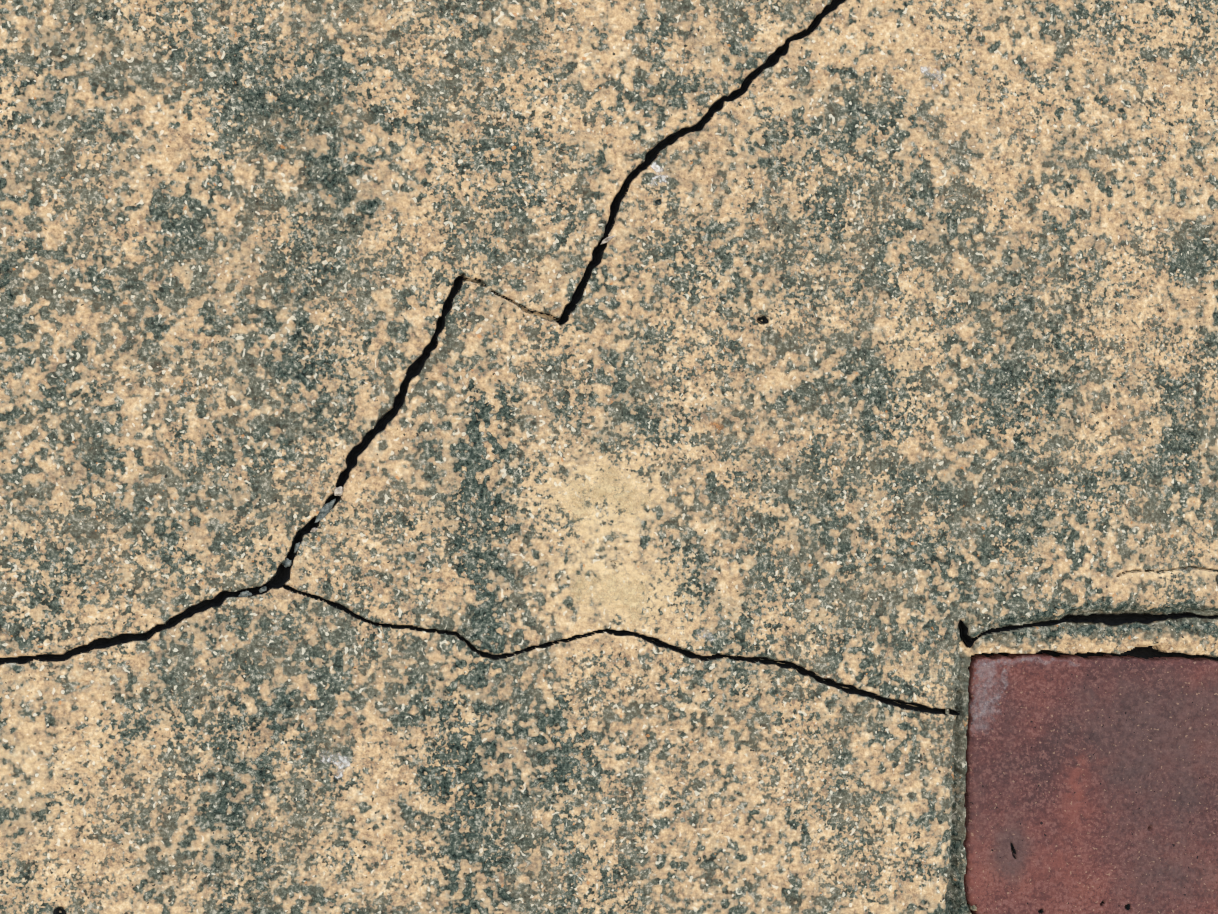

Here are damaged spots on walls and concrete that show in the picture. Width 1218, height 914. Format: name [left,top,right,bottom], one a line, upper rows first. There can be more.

crack [0,0,961,715]
crack [958,613,1218,670]